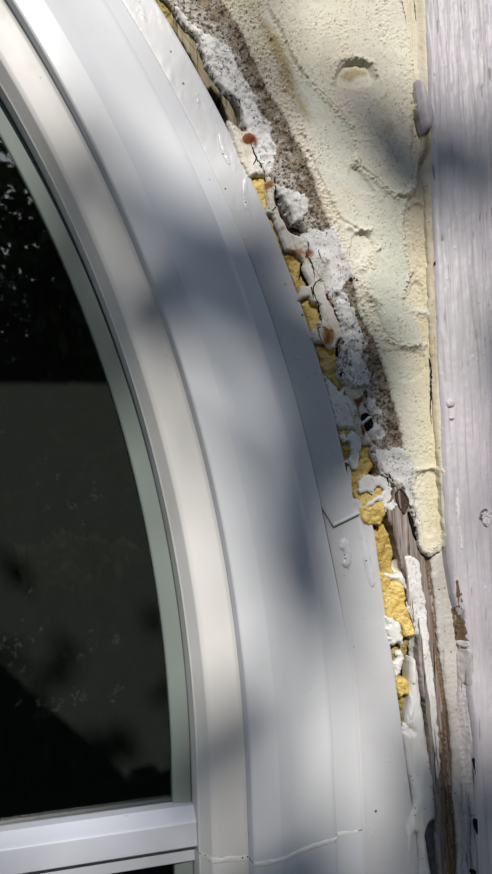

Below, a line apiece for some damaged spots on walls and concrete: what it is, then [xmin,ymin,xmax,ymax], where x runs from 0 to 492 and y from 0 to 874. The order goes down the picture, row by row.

spalling [160,0,424,539]
peeling [391,556,441,778]